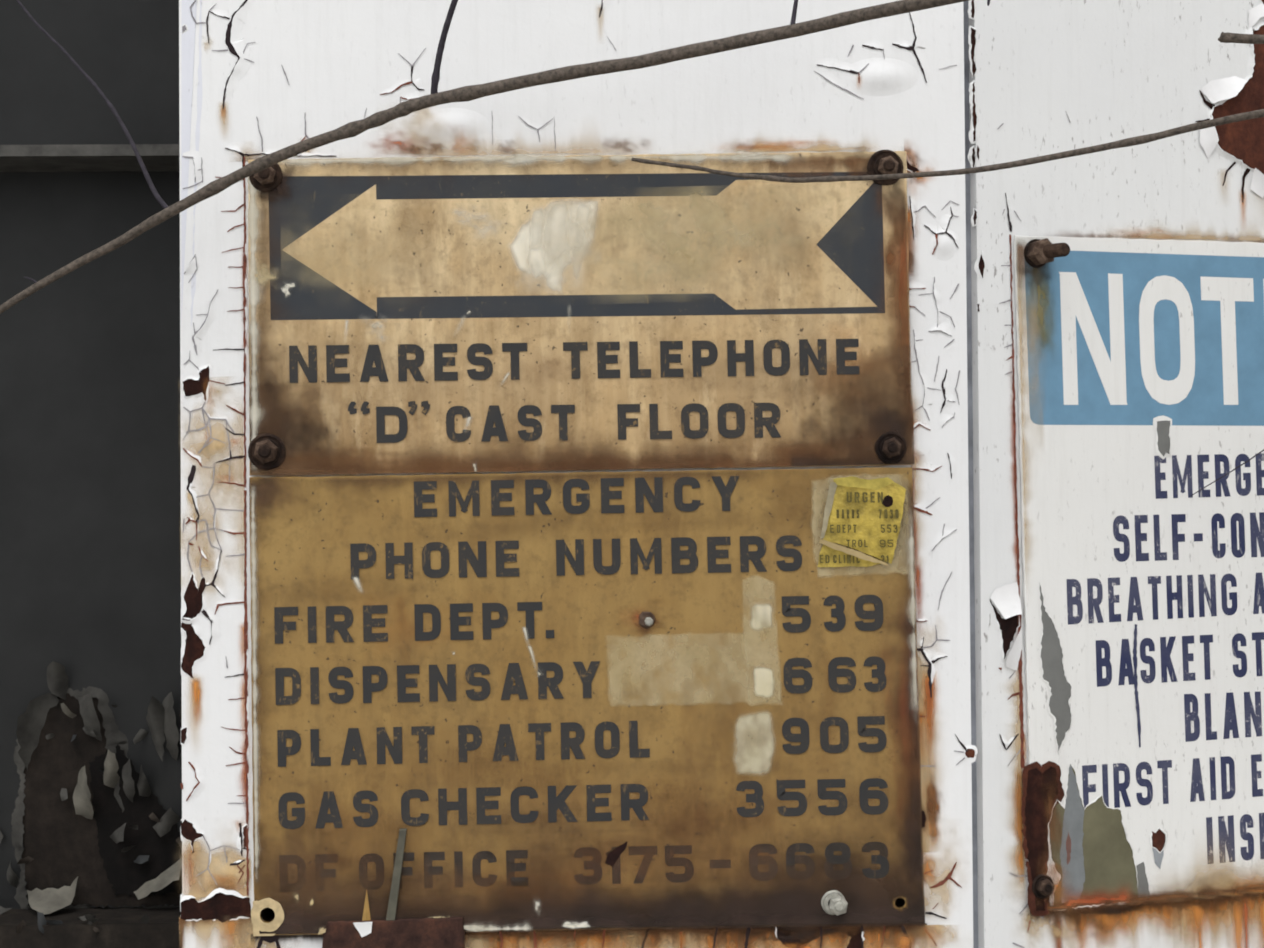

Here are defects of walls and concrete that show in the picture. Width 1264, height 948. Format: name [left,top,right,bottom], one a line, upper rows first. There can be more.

crack [364,48,426,119]
corrosion [747,143,869,176]
crack [814,11,957,100]
peeling [1195,0,1264,202]
peeling [181,569,209,680]
peeling [181,363,212,404]
crack [180,0,337,895]
corrosion [179,204,950,948]
crack [909,196,961,717]
crack [999,193,1025,768]
peeling [0,661,253,934]
corrosion [1027,870,1264,948]